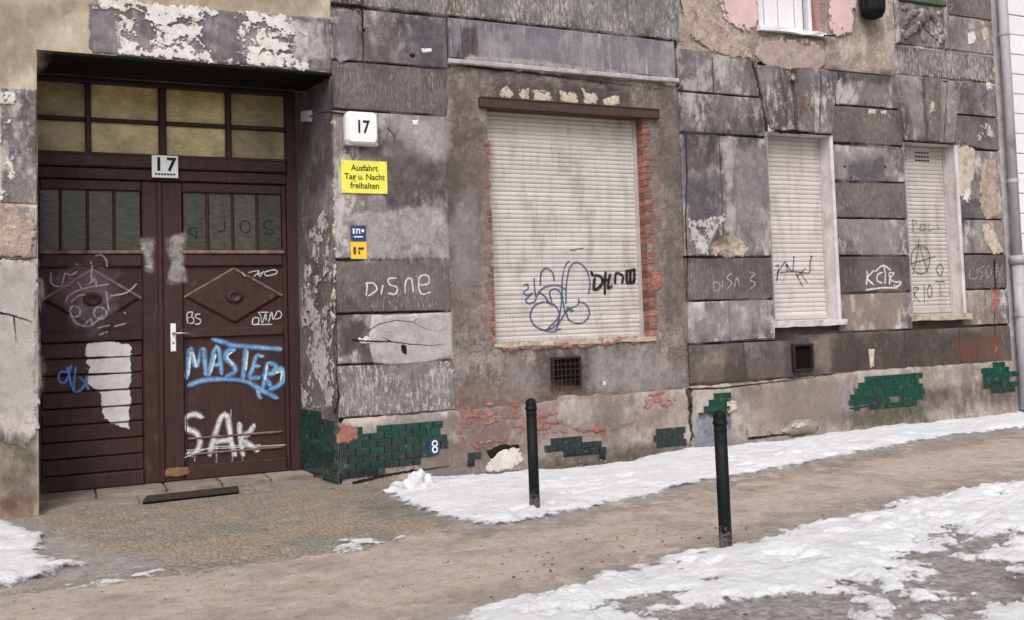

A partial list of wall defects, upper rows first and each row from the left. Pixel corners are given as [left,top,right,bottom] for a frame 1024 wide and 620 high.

peeling [93,0,310,71]
peeling [0,91,17,143]
spalling [499,85,620,106]
spalling [955,123,1003,255]
peeling [301,120,337,410]
flaking render [485,118,663,352]
peeling [688,213,749,257]
crack [679,62,843,445]
flaking render [458,396,605,473]